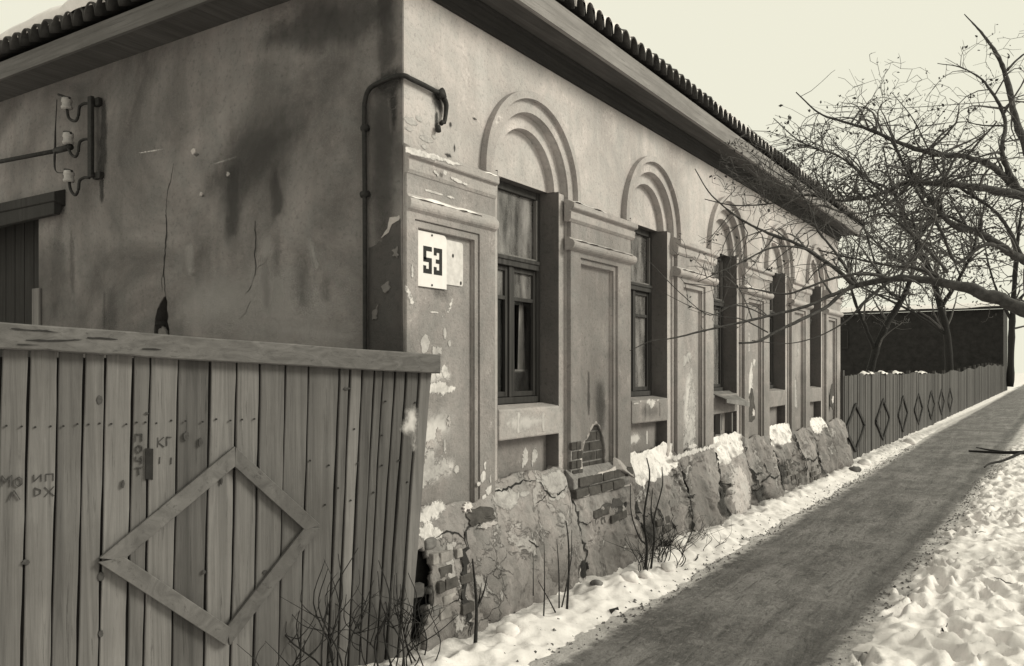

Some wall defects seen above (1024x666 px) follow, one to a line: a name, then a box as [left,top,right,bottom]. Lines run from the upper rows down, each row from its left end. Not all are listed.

peeling [405,145,467,185]
crack [161,169,173,297]
crack [245,228,267,314]
spalling [368,215,416,352]
flaking render [419,421,635,621]
crack [495,479,591,561]